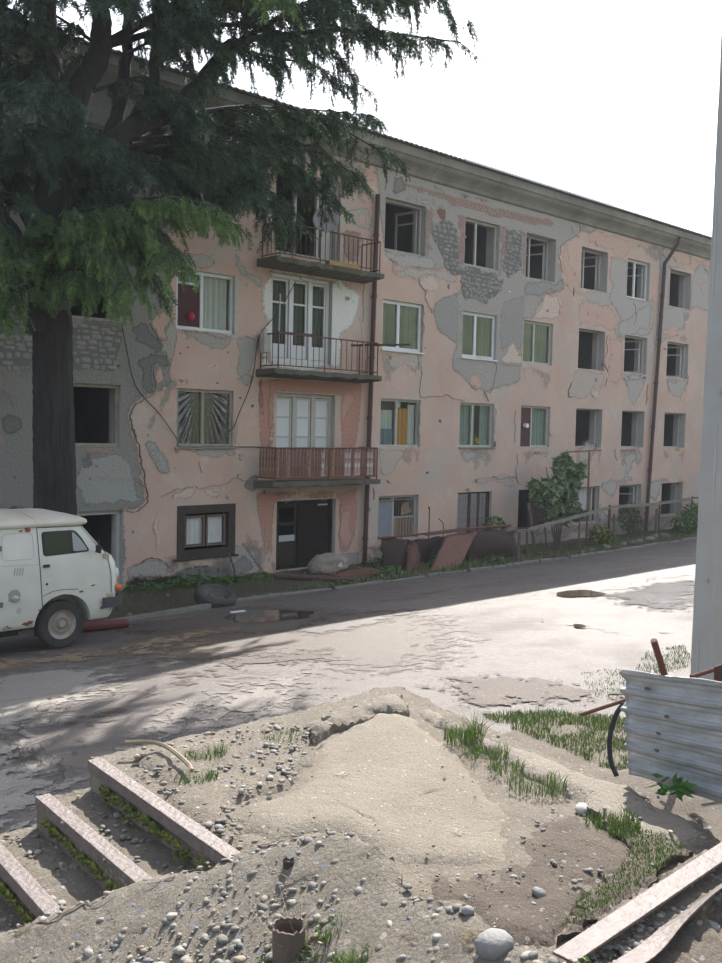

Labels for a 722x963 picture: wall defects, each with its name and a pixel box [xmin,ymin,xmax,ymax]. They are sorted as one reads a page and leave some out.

spalling [87,90,112,126]
spalling [3,203,25,233]
spalling [343,167,710,401]
spalling [0,365,34,509]
spalling [73,248,360,585]